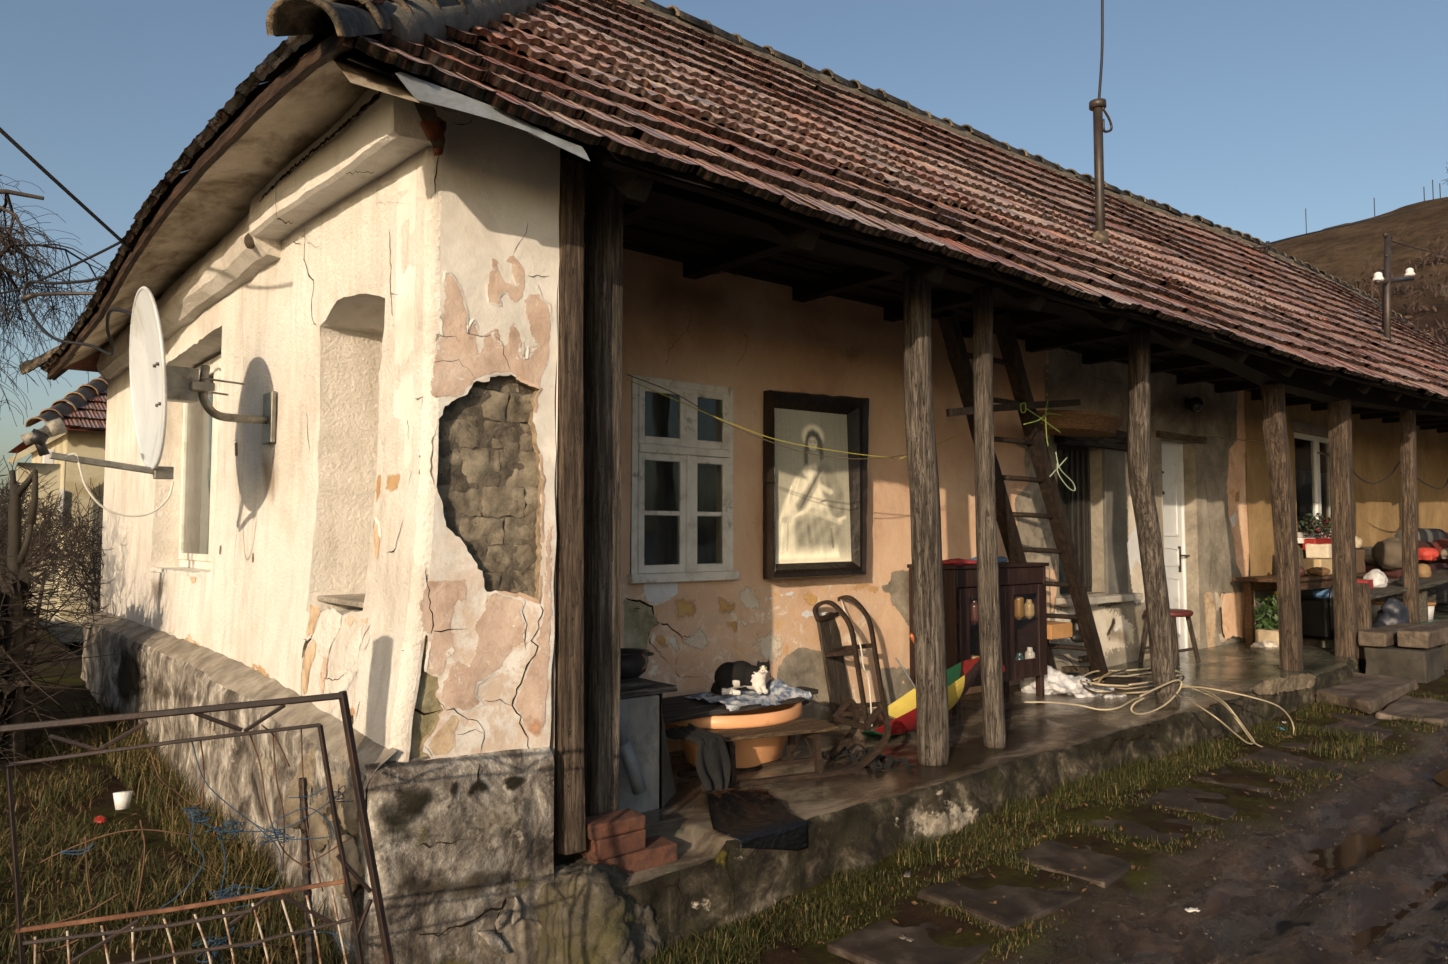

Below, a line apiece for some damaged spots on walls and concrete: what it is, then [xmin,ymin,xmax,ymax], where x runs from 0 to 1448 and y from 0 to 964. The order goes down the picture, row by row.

crack [259,91,382,324]
flaking render [402,255,553,760]
flaking render [301,605,328,694]
crack [425,571,454,633]
crack [425,605,543,781]
flaking render [620,582,696,651]
water stain [810,808,879,855]
water stain [896,722,1049,844]